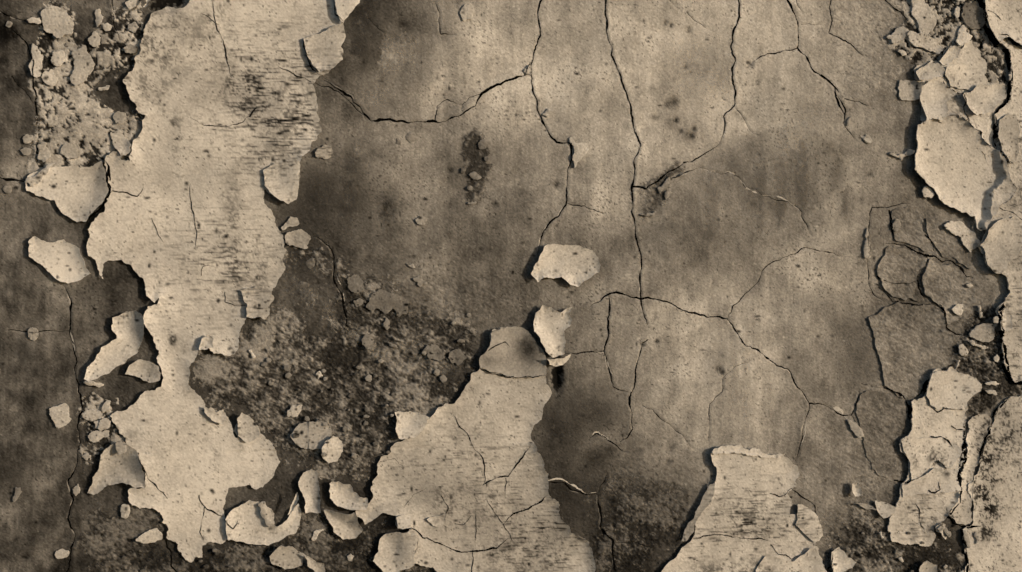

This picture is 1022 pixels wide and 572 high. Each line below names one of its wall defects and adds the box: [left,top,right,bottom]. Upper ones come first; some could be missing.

crack [0,11,40,182]
crack [281,0,602,251]
crack [313,236,347,332]
peeling [20,0,827,572]
crack [478,341,546,378]
crack [566,0,1022,572]
peeling [823,0,1022,572]
crack [404,412,653,572]